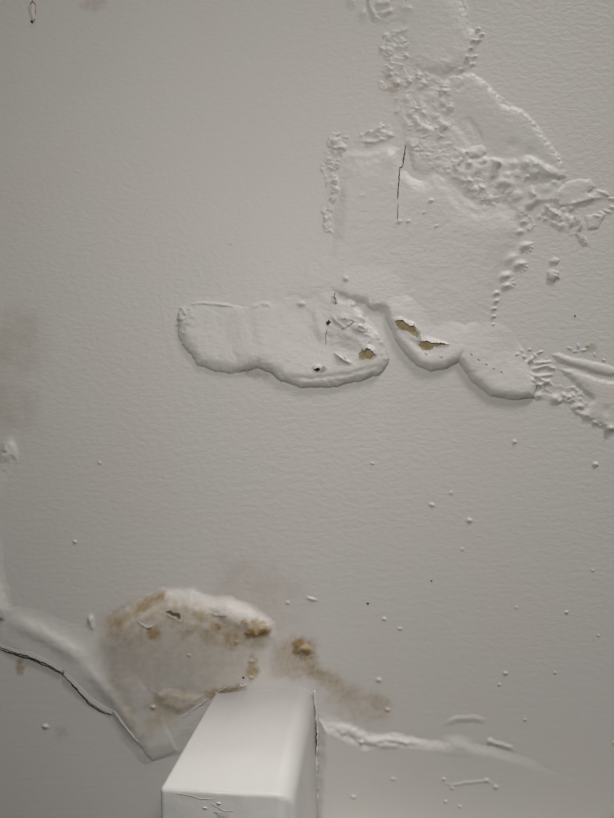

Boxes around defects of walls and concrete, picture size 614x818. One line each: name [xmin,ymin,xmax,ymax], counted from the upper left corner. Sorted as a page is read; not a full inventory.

crack [397,145,406,220]
peeling [174,283,539,401]